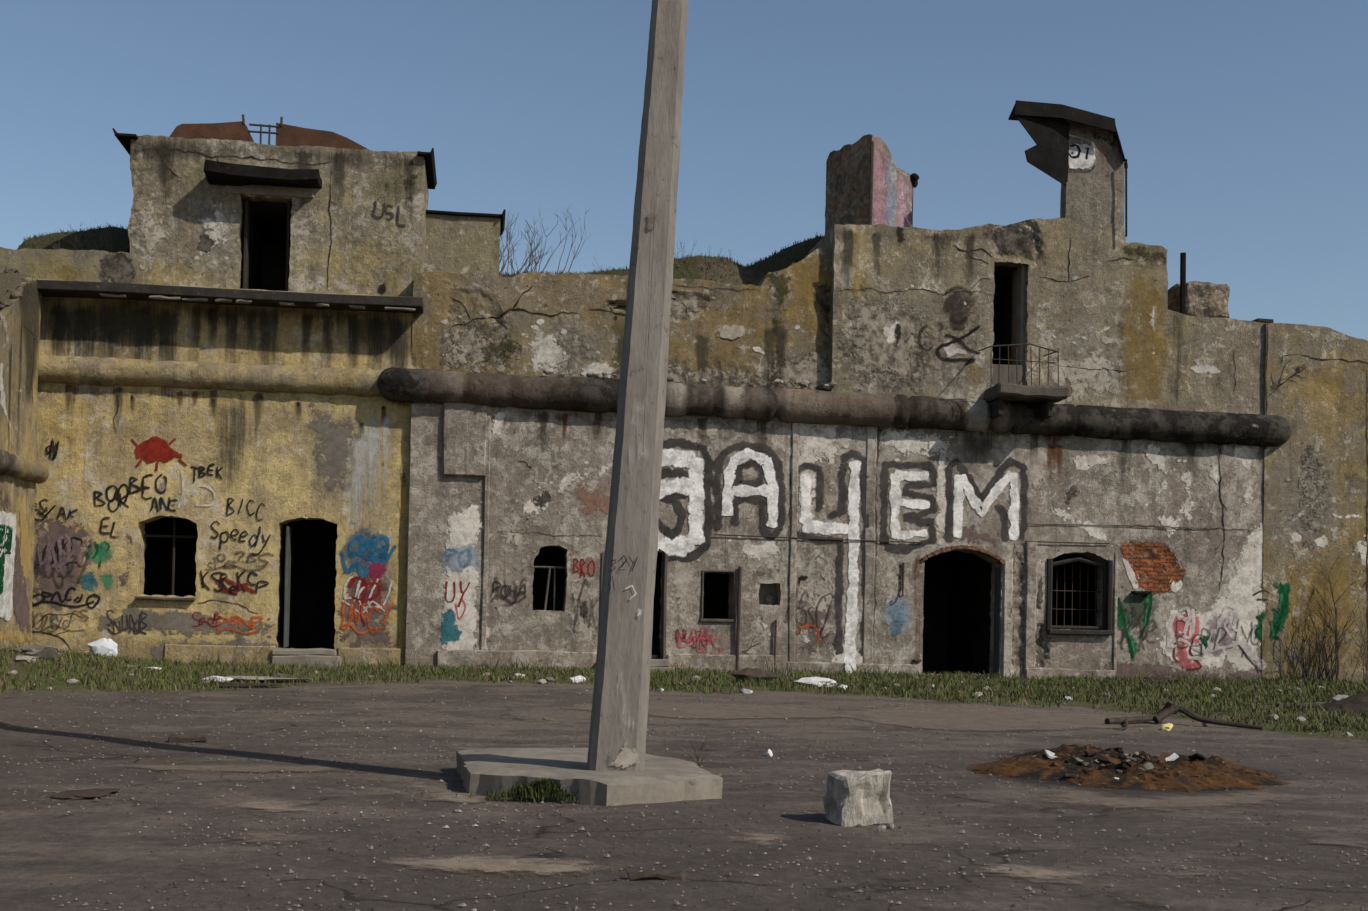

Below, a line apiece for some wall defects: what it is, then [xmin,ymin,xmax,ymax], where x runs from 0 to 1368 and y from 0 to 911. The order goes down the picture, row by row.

spalling [95,193,175,298]
damp [0,279,277,428]
spalling [149,295,252,304]
spalling [198,229,215,252]
crack [134,148,336,292]
damp [302,312,415,365]
crack [450,222,759,468]
crack [1039,238,1133,282]
damp [1149,306,1160,354]
damp [115,388,134,436]
peeling [1020,437,1269,680]
crack [1116,447,1260,591]